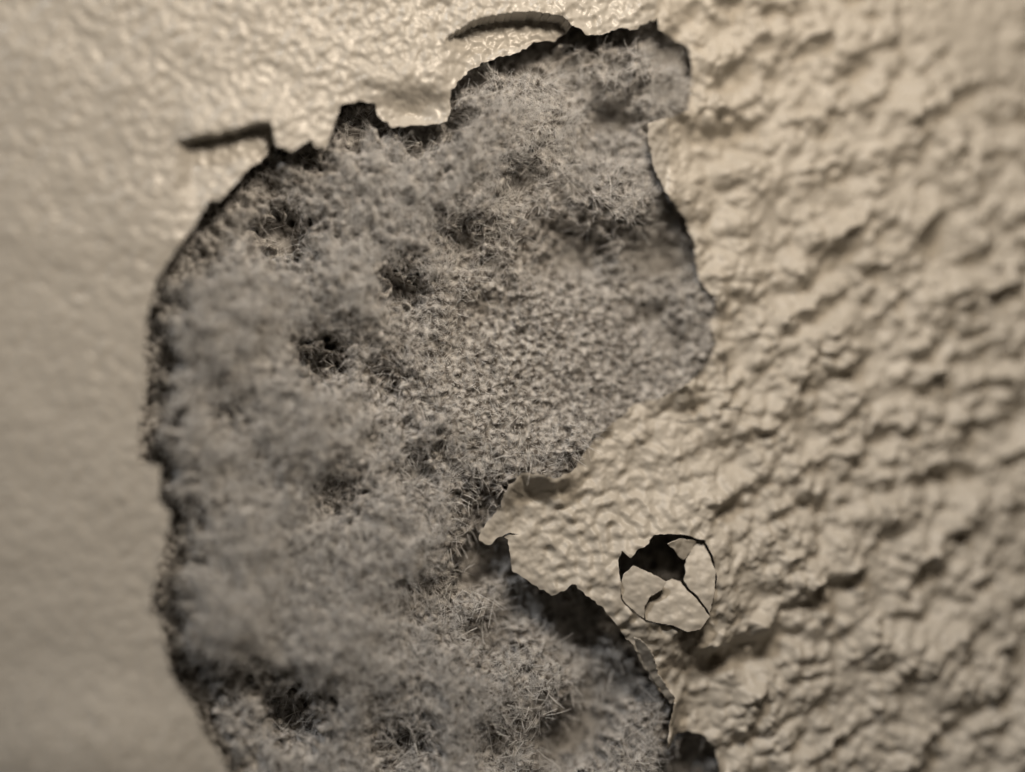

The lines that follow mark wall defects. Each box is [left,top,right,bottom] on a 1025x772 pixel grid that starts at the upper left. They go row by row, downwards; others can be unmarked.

flaking render [139,19,719,772]